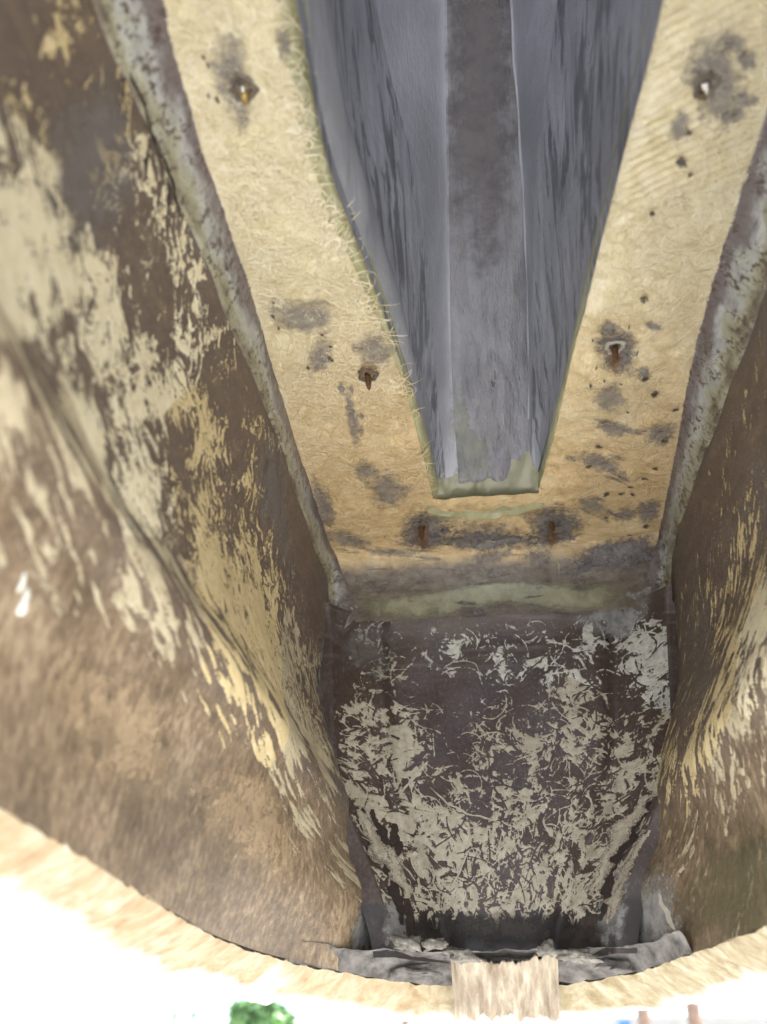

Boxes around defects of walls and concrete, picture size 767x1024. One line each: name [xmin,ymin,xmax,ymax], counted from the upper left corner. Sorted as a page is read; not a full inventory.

water stain [202,34,248,126]
water stain [686,37,757,122]
water stain [271,302,334,370]
water stain [311,445,661,591]
peeling [349,621,415,686]
peeling [421,649,465,678]